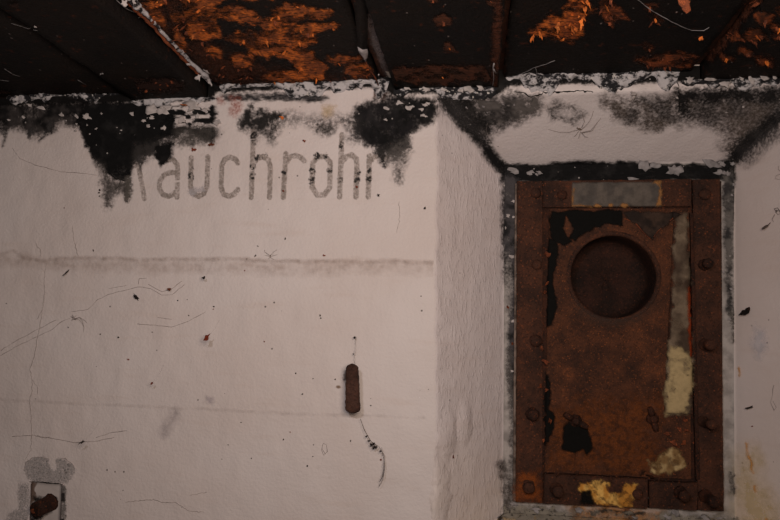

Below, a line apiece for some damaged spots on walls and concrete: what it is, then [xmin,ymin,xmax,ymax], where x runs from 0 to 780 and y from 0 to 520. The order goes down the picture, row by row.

corrosion [124,0,373,85]
corrosion [528,0,630,44]
corrosion [637,0,780,72]
water stain [155,142,174,166]
water stain [728,111,780,163]